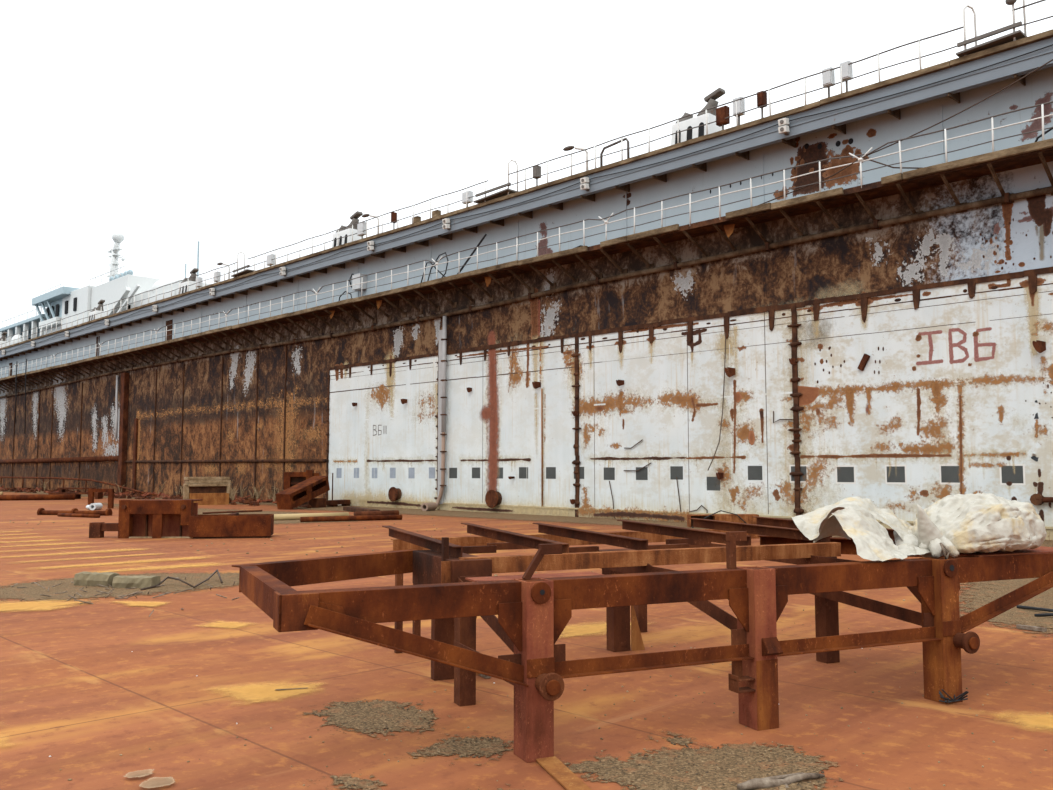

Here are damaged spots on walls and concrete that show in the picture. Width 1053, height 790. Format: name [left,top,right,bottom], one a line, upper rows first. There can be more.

corrosion [536,222,553,256]
corrosion [563,188,1053,521]
corrosion [371,355,394,410]
corrosion [417,384,438,422]
corrosion [457,288,549,491]
corrosion [136,385,327,486]
corrosion [345,494,428,509]
corrosion [451,487,689,522]